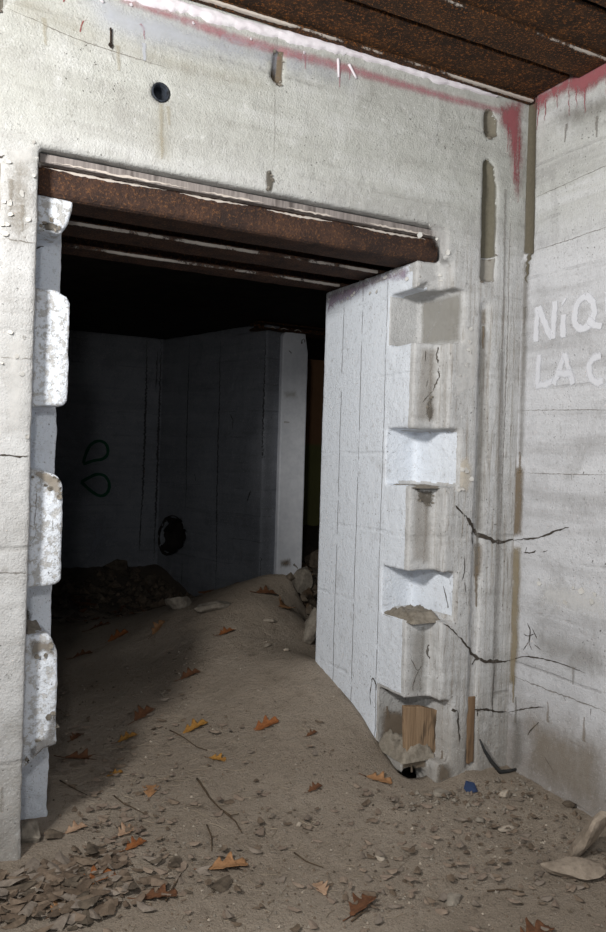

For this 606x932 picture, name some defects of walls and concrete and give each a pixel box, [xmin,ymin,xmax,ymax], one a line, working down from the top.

spalling [157,515,187,559]
crack [443,189,604,742]